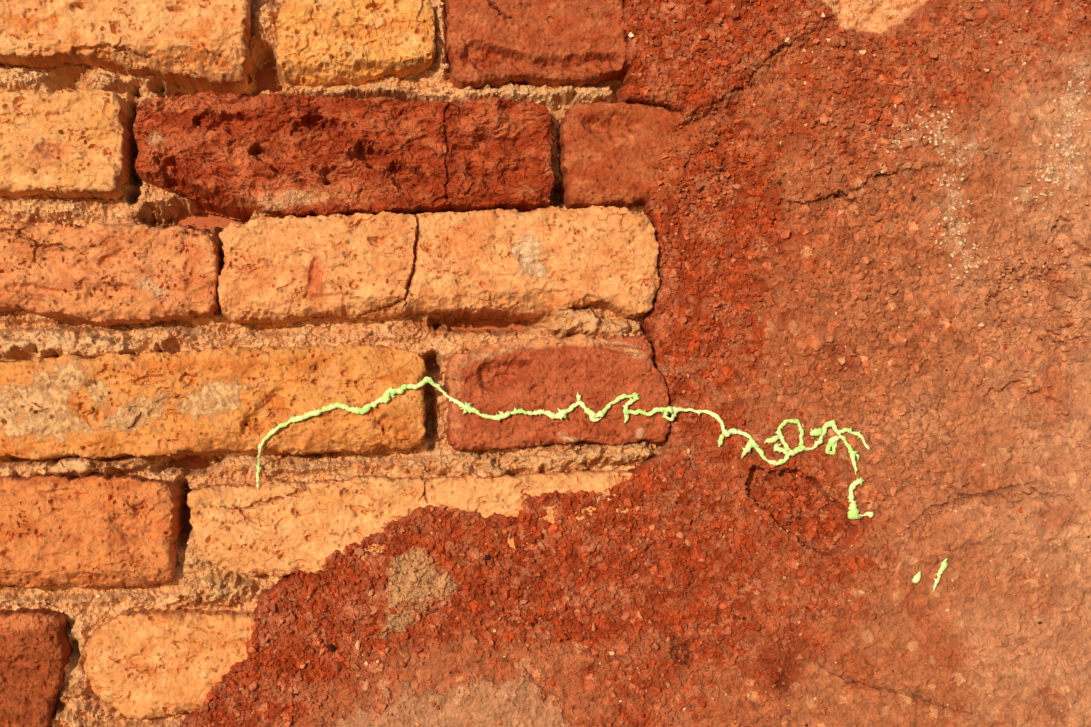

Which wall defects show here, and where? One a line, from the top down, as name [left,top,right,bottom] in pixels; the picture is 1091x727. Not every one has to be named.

spalling [165,4,188,13]
spalling [354,2,385,26]
spalling [822,0,929,35]
spalling [354,58,385,80]
spalling [458,38,625,84]
spalling [149,148,213,210]
crack [769,162,936,212]
spalling [180,95,860,727]
spalling [107,498,166,548]
crack [894,480,1073,538]
spalling [0,644,62,717]